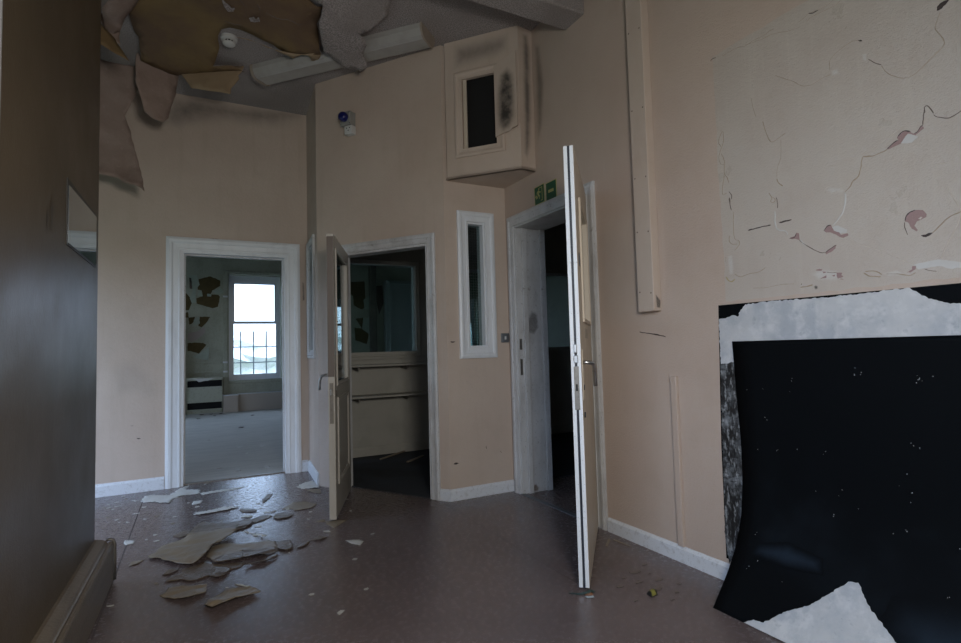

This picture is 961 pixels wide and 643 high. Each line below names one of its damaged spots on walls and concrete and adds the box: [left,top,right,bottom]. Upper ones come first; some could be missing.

leakage [450,29,546,162]
peeling [774,193,916,272]
peeling [904,210,961,237]